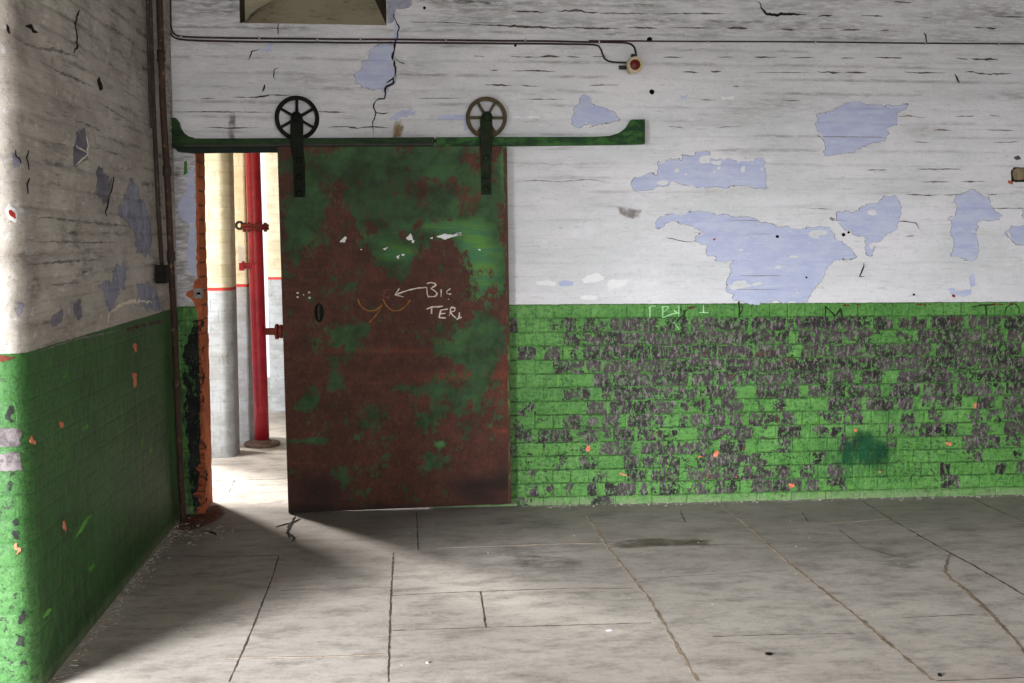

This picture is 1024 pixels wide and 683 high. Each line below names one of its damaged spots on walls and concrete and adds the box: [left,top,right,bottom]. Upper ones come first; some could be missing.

peeling [96,166,152,258]
peeling [354,0,412,93]
peeling [571,94,620,128]
crack [319,1,929,137]
peeling [630,151,767,191]
peeling [815,101,909,156]
crack [973,16,1024,29]
rust [186,278,202,313]
peeling [509,189,1024,506]
spalling [193,313,206,513]
water stain [842,433,886,464]
crack [943,554,1024,653]